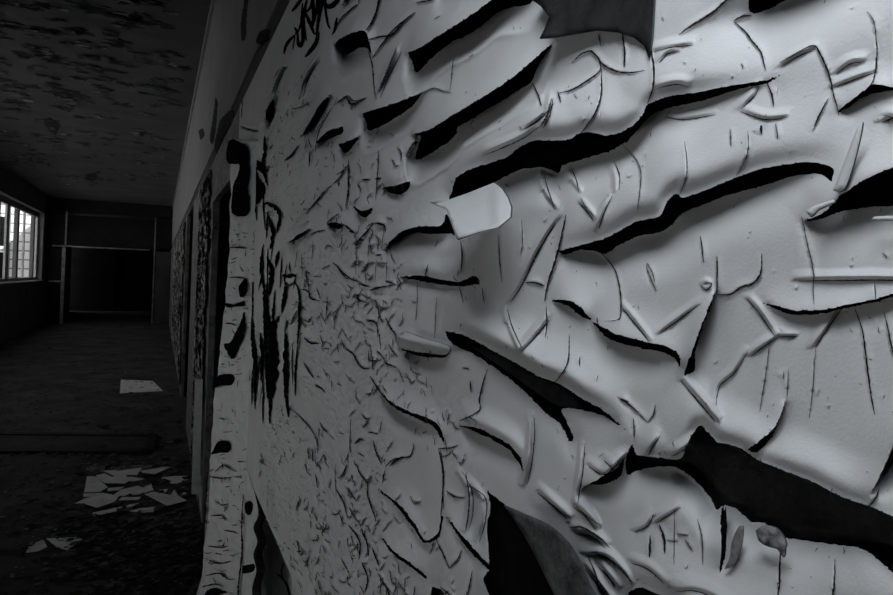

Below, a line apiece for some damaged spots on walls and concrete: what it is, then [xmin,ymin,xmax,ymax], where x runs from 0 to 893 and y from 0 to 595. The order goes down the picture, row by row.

peeling [748,0,785,13]
peeling [301,0,775,251]
crack [498,33,655,136]
crack [623,133,651,209]
peeling [558,61,893,255]
peeling [190,170,234,464]
peeling [224,279,248,359]
crack [202,67,489,595]
crack [498,197,594,338]
crack [532,251,640,383]
peeling [377,254,893,595]
crack [618,397,656,436]